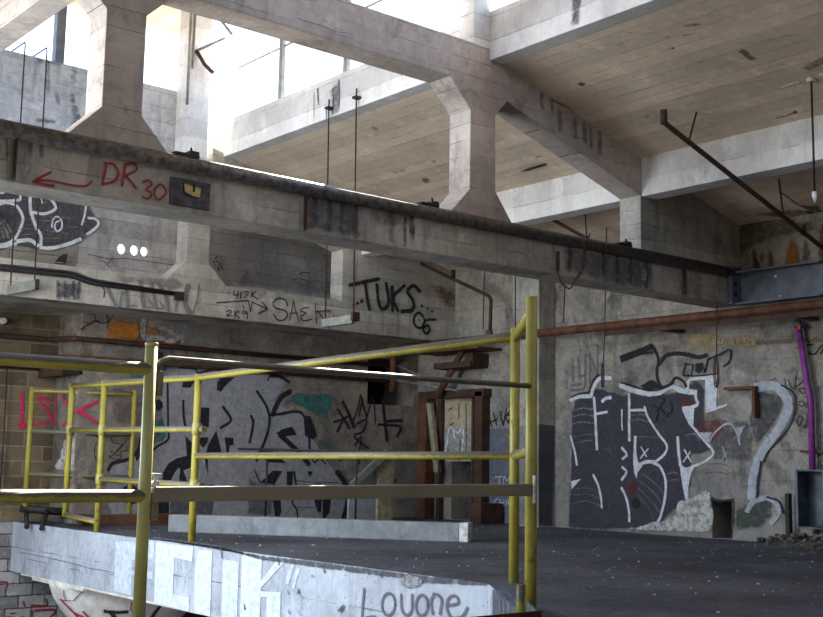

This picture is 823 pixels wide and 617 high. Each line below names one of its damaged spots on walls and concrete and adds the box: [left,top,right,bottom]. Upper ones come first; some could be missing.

damp [309,197,359,235]
damp [403,216,415,246]
corrosion [785,226,823,264]
peeling [627,490,734,534]